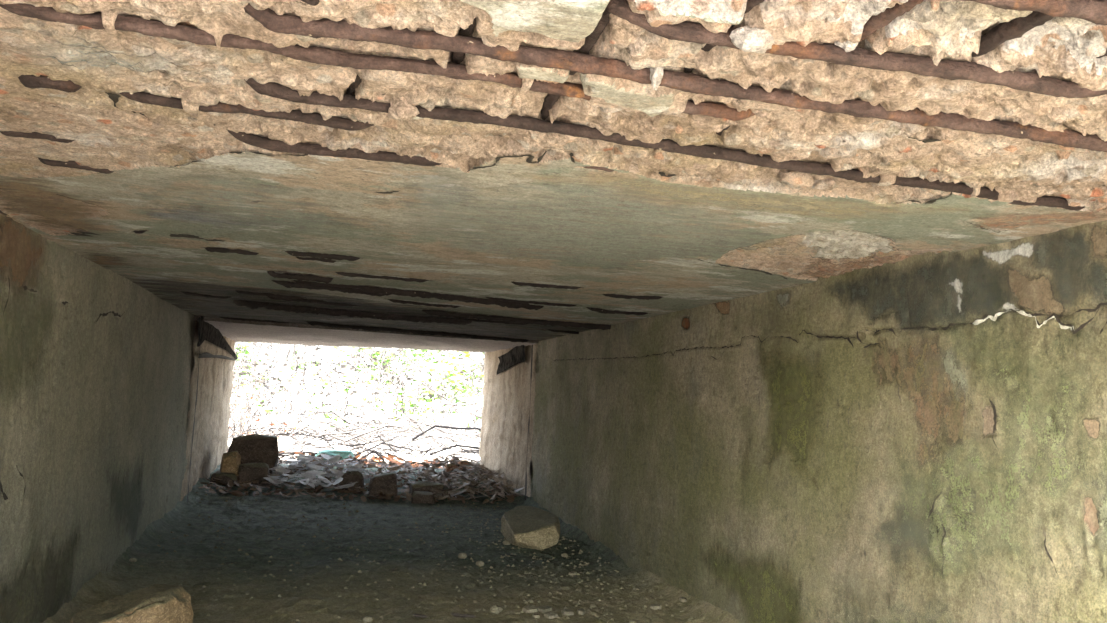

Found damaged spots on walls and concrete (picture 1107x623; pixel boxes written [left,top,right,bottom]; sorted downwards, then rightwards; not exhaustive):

spalling [0,0,1107,214]
spalling [0,190,110,236]
spalling [715,229,953,281]
water stain [798,207,1107,331]
water stain [942,350,966,388]
crack [525,293,1107,500]
water stain [877,513,930,562]